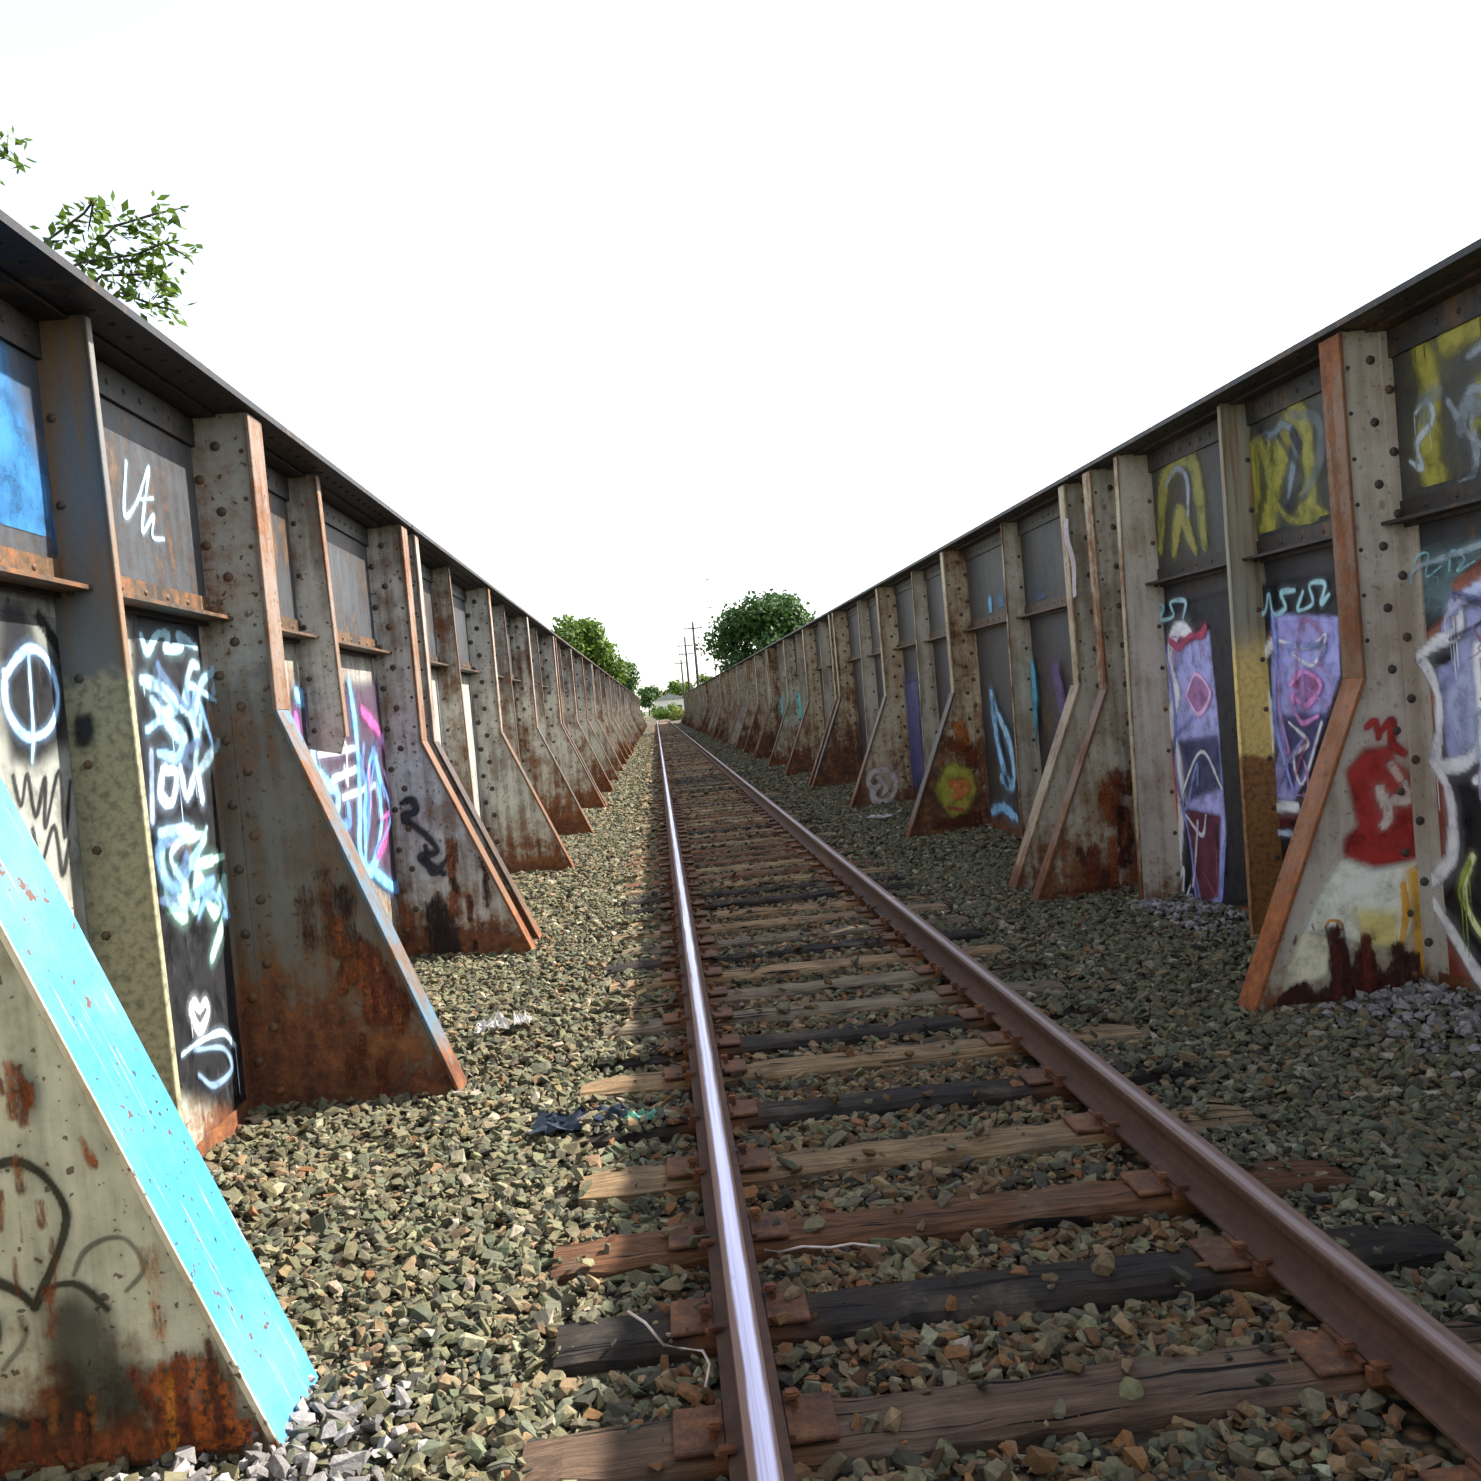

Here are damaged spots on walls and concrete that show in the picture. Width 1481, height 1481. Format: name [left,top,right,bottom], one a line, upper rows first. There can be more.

rust [941,719,978,768]
rust [933,810,983,830]
rust [1059,768,1134,894]
rust [445,838,491,922]
rust [294,867,413,1097]
rust [0,1060,34,1128]
rust [80,1138,98,1169]
rust [0,1155,57,1338]
rust [145,1249,165,1338]
rust [0,1338,254,1479]